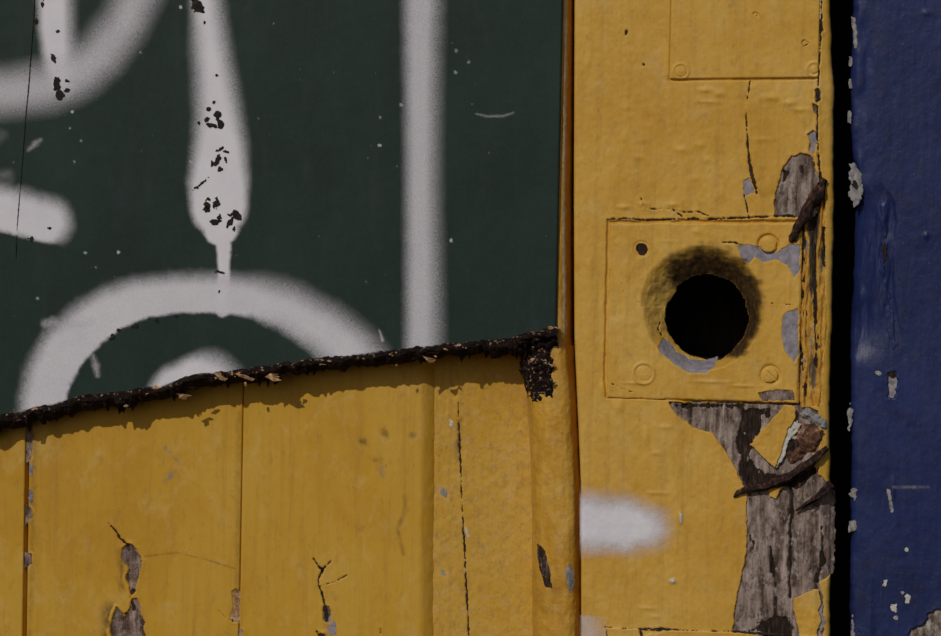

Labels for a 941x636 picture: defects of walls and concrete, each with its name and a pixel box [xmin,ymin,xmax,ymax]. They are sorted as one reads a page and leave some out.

crack [607,80,795,221]
peeling [774,154,820,219]
spalling [848,162,863,207]
peeling [722,241,801,277]
peeling [782,309,799,362]
peeling [670,401,836,636]
peeling [106,523,146,636]
spalling [218,589,243,636]
peeling [909,609,941,636]